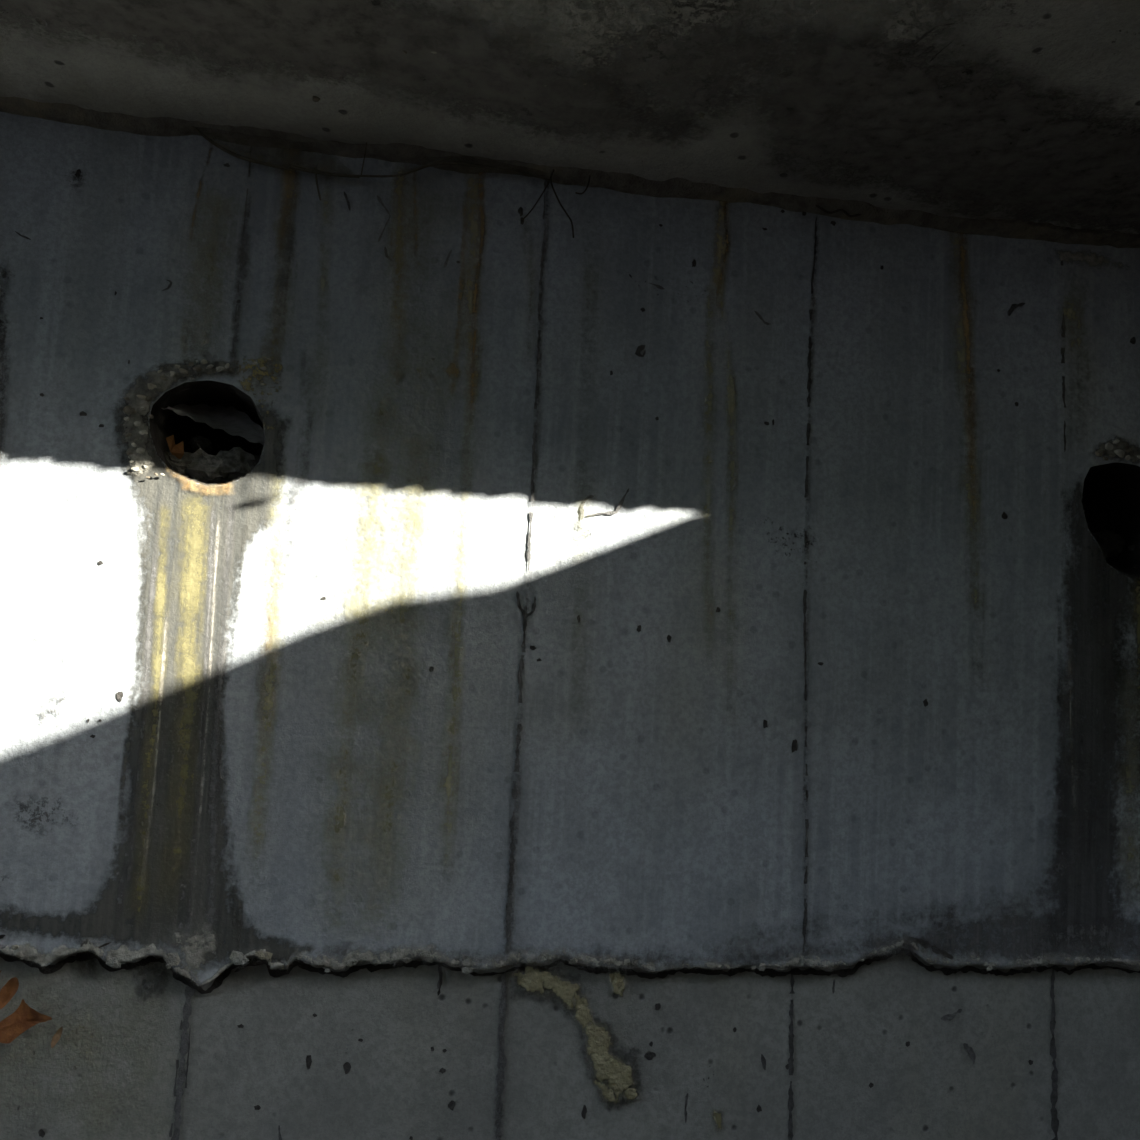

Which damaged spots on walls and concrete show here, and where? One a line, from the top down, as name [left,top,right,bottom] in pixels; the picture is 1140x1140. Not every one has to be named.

spalling [122,357,234,479]
crack [504,180,549,954]
crack [580,488,629,520]
crack [635,345,646,357]
crack [804,217,818,500]
crack [1008,302,1025,316]
crack [1059,314,1067,452]
leakage [0,404,312,1000]
crack [801,531,809,952]
leakage [576,482,1140,970]
spalling [0,940,1140,1110]
crack [0,935,1140,1140]